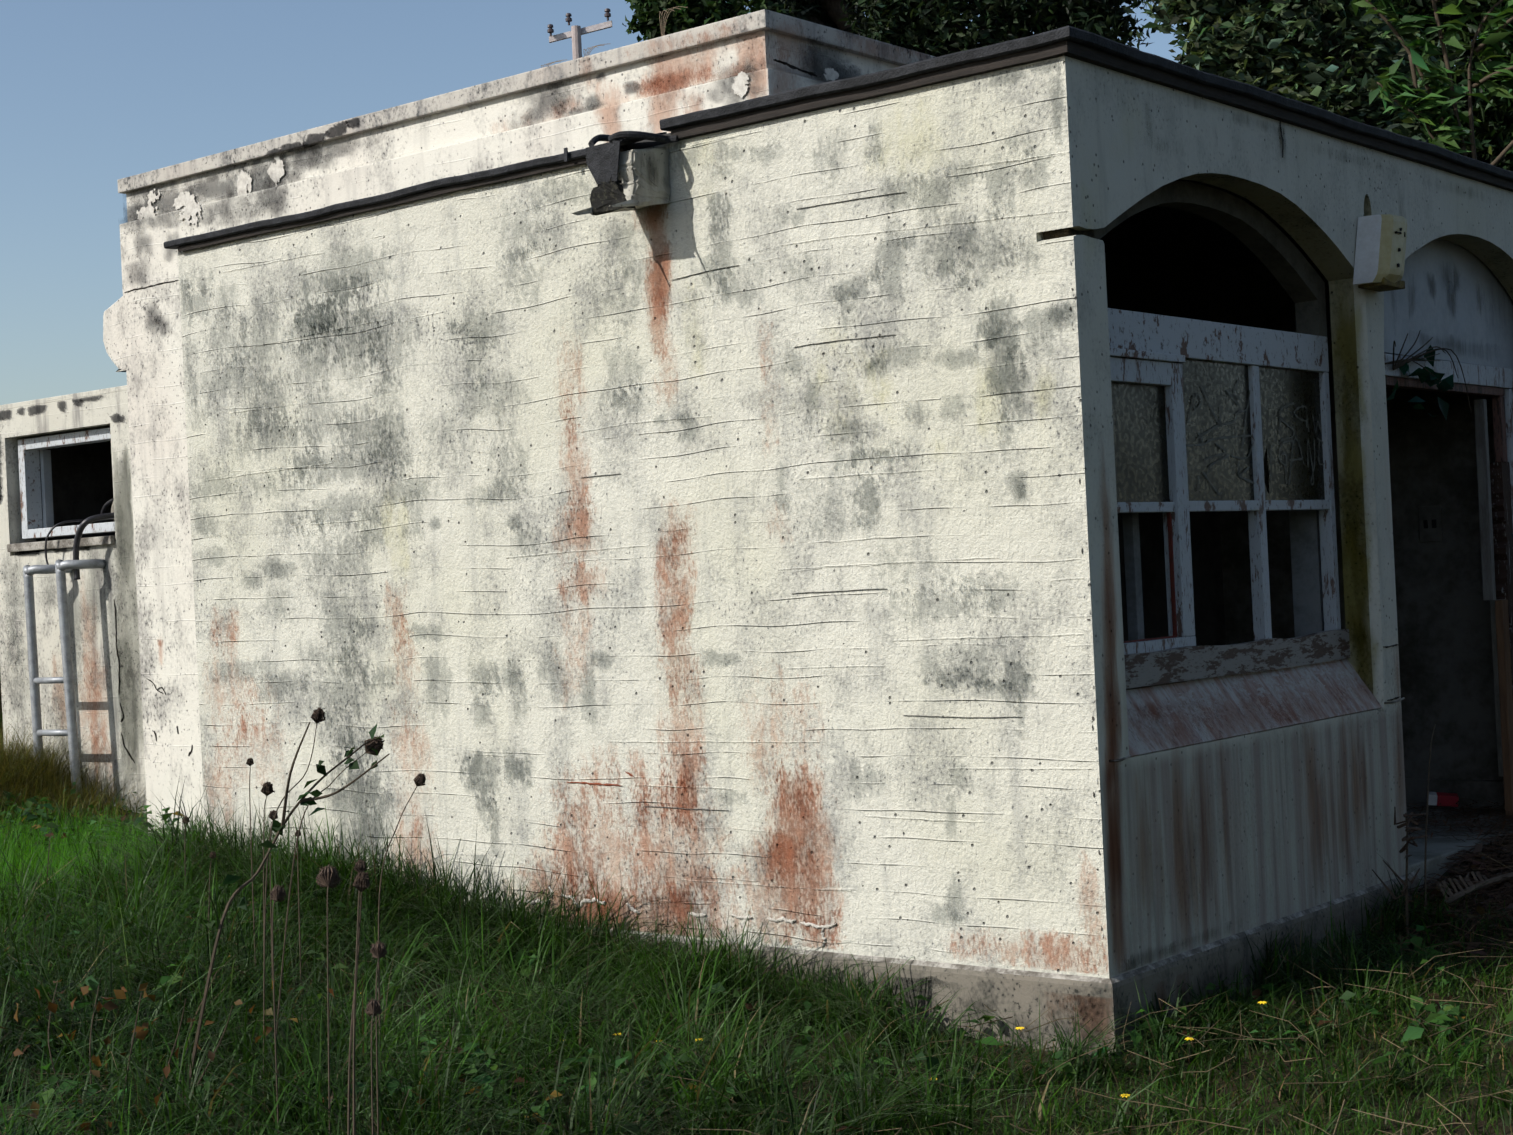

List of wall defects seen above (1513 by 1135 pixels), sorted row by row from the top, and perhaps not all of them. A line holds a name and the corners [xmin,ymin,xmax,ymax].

peeling [137,188,202,226]